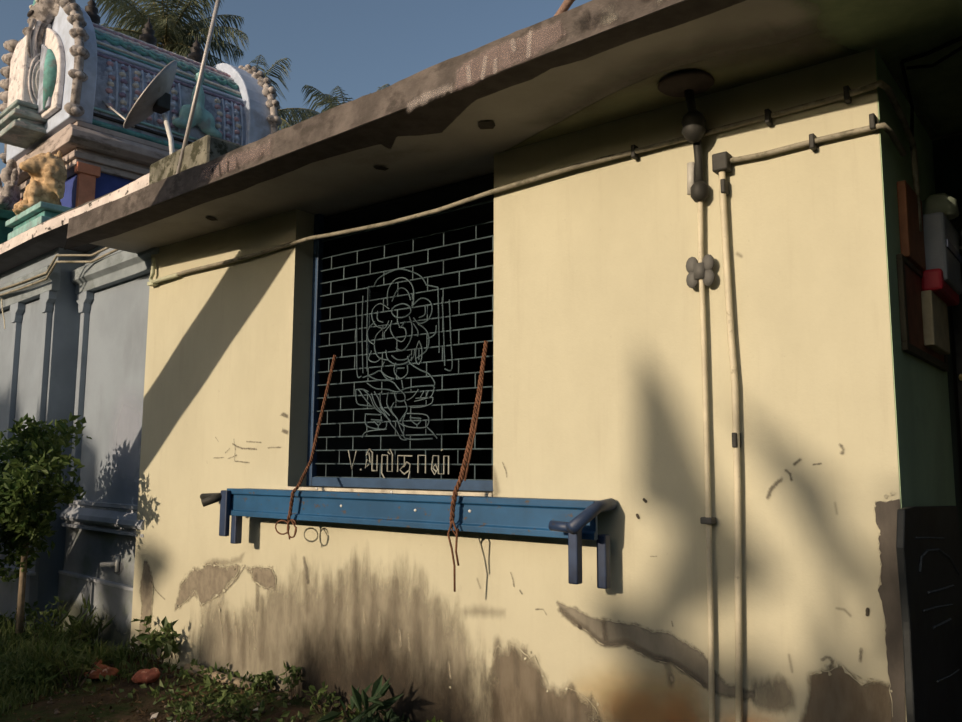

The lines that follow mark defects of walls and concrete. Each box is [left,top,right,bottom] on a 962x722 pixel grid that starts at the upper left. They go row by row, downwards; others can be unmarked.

peeling [138,559,161,645]
peeling [175,563,277,610]
damp [198,571,600,722]
flaking render [873,491,905,722]